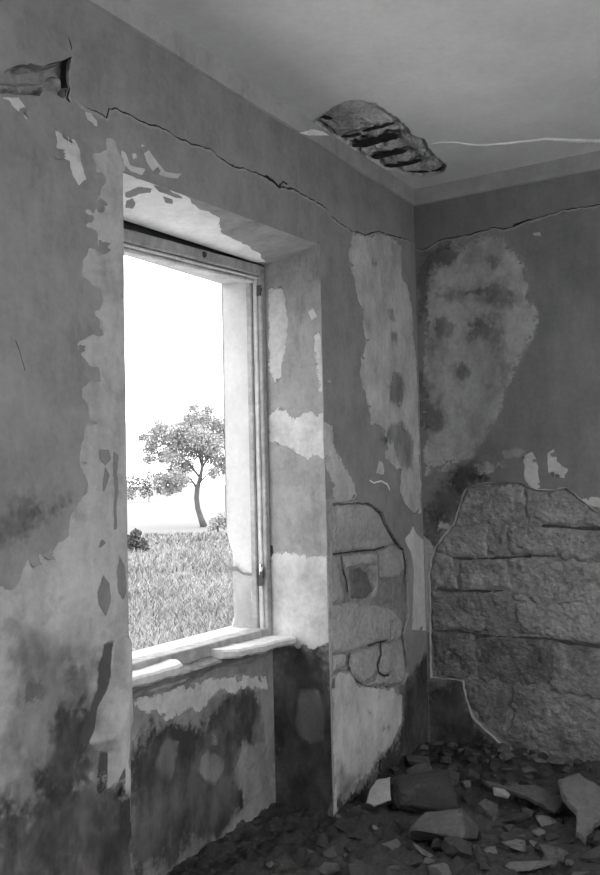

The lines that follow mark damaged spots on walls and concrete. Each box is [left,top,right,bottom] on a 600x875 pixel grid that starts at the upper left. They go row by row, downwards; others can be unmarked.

flaking render [0,56,72,119]
crack [60,37,600,252]
flaking render [300,100,447,176]
peeling [267,285,288,384]
peeling [314,333,331,393]
peeling [347,231,422,514]
damp [419,233,539,495]
peeling [0,131,268,875]
flaking render [268,406,600,813]
damp [0,642,264,875]